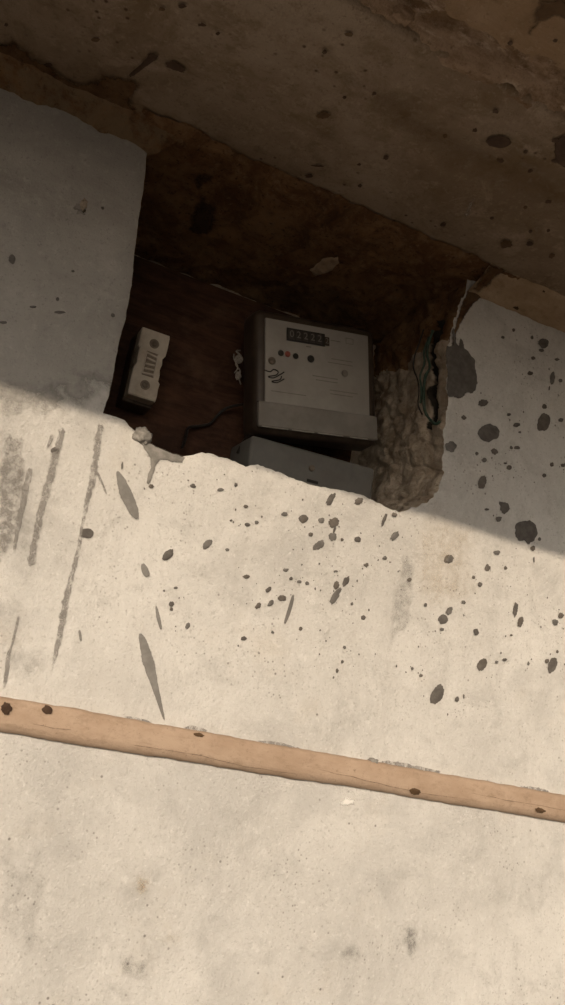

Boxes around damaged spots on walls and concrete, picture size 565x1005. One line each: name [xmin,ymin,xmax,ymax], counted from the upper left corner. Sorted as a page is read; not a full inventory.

damp [529,0,565,34]
flaking render [310,257,339,276]
damp [446,328,493,409]
damp [475,406,525,488]
damp [0,438,32,550]
damp [28,429,65,565]
damp [116,462,139,519]
damp [54,425,106,657]
damp [4,617,19,682]